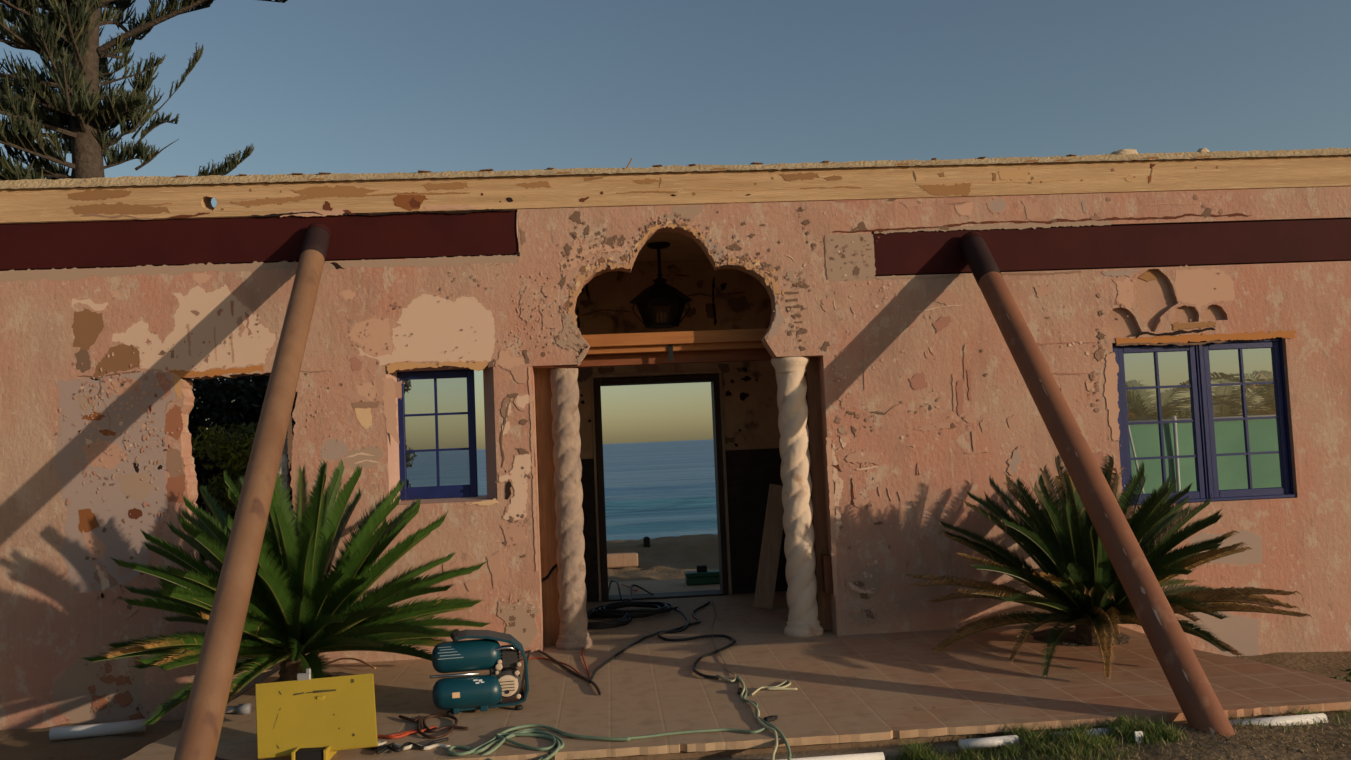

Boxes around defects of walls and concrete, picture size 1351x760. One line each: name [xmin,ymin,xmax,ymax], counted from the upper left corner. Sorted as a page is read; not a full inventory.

spalling [280,209,350,217]
spalling [796,207,876,281]
crack [816,199,1250,280]
peeling [72,298,108,311]
peeling [555,196,830,404]
peeling [1173,268,1235,313]
peeling [327,294,546,402]
peeling [93,273,276,504]
peeling [501,393,529,435]
spalling [121,508,142,523]
peeling [495,448,532,523]
peeling [53,655,146,724]